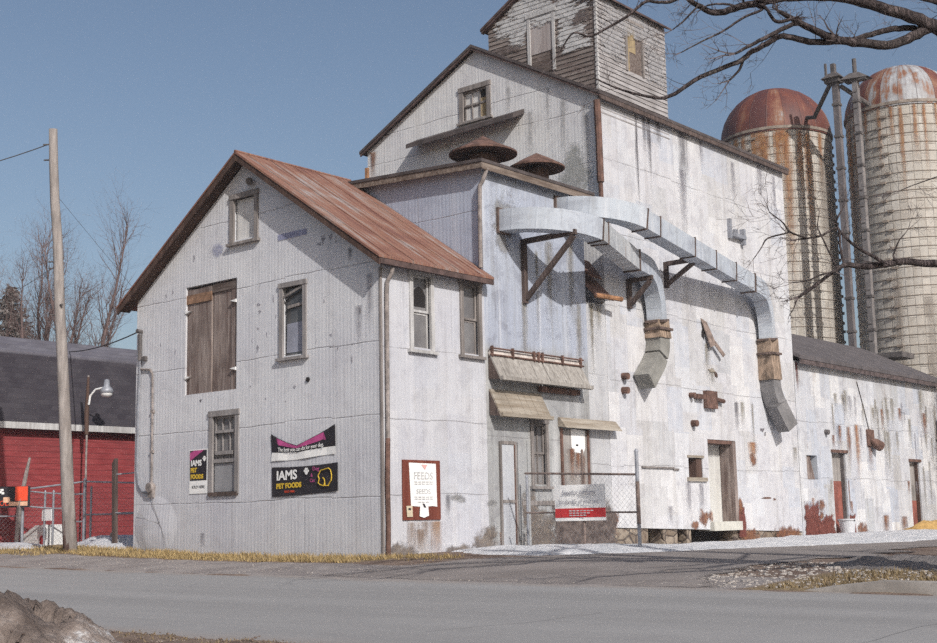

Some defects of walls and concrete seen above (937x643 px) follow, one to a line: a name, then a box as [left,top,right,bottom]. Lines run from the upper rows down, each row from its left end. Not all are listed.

peeling [493,0,666,87]
corrosion [877,106,904,156]
corrosion [913,103,937,132]
corrosion [848,113,867,219]
corrosion [833,425,871,452]
peeling [804,502,836,535]